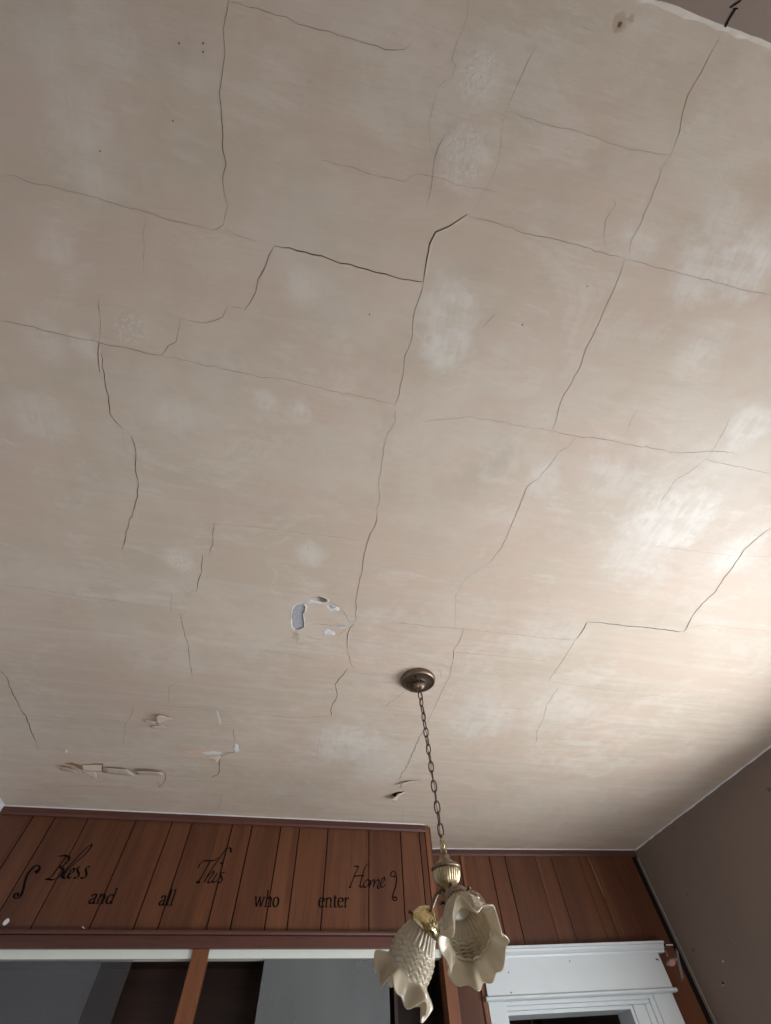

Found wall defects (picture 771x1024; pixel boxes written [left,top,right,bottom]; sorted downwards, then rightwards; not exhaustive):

crack [7,0,771,778]
spalling [289,596,347,642]
crack [0,671,38,751]
peeling [59,762,163,780]